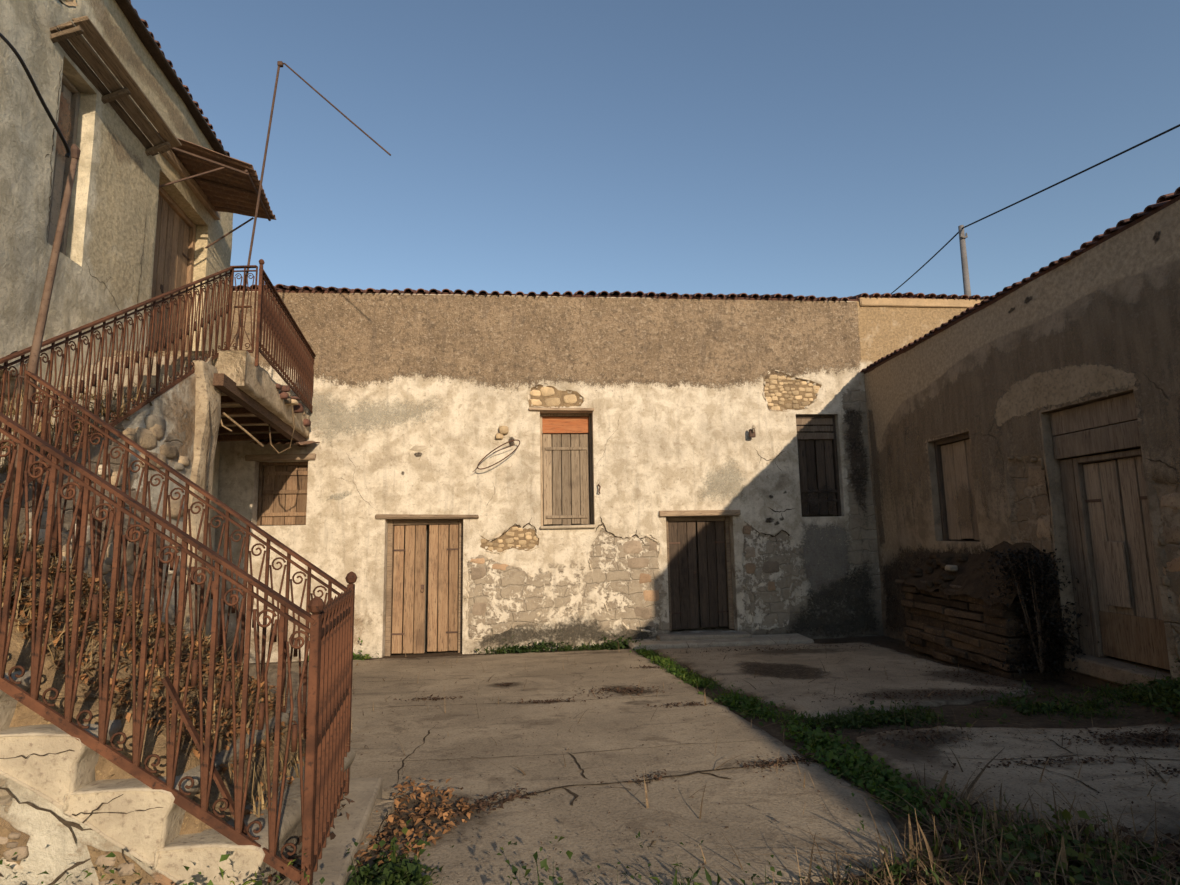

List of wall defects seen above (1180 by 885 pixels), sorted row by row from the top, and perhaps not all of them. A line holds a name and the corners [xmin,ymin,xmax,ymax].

flaking render [226,292,861,411]
flaking render [98,464,128,487]
flaking render [123,414,189,471]
water stain [869,280,1180,545]
flaking render [466,525,545,640]
flaking render [588,526,661,633]
flaking render [742,518,797,630]
water stain [790,560,877,637]
crack [365,670,684,781]
crack [385,739,825,827]
spalling [0,817,30,870]